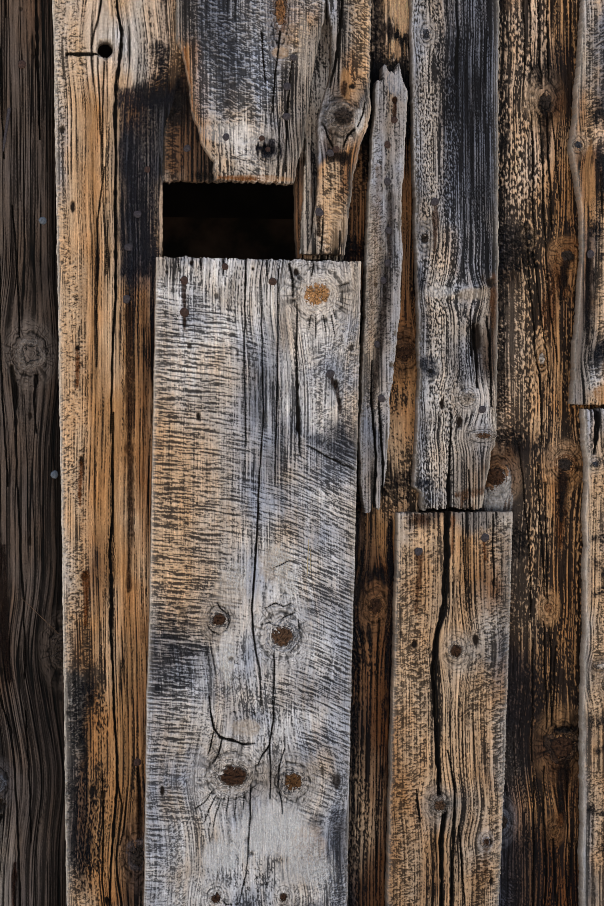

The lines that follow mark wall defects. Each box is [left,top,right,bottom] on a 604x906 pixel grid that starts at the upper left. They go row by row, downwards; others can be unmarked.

crack [0,48,8,127]
crack [33,0,41,102]
crack [67,0,123,418]
crack [0,207,37,638]
crack [102,447,126,906]
crack [195,222,352,905]
crack [370,361,384,514]
crack [373,623,381,867]
crack [416,413,470,906]
crack [489,515,497,595]